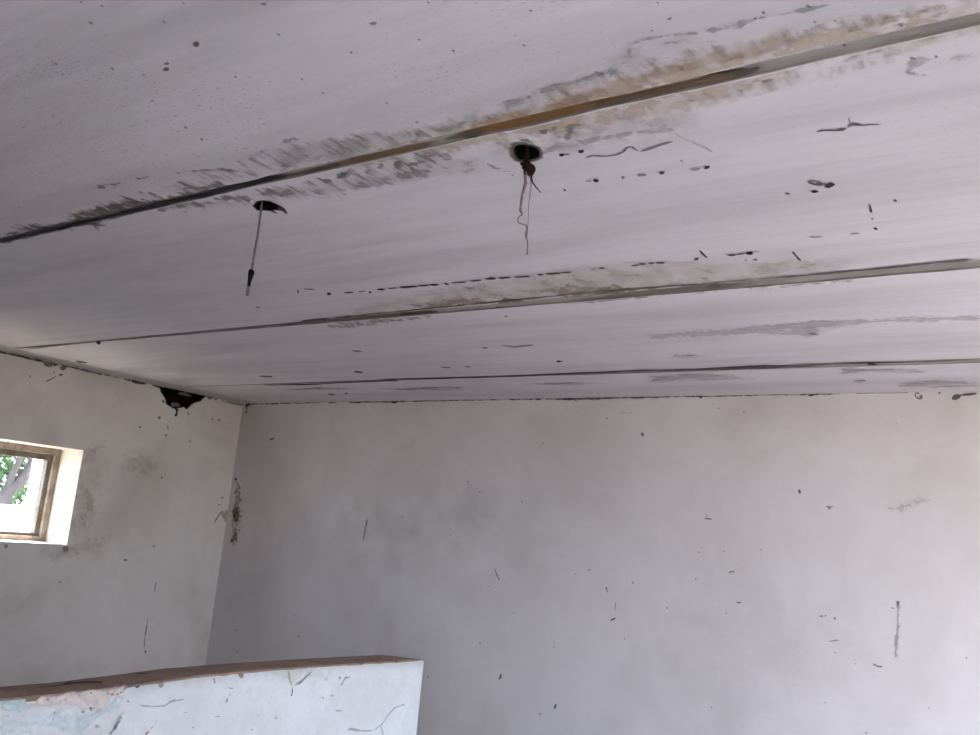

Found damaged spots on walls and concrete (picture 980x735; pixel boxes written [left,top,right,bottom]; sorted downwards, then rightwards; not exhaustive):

damp [628,28,721,53]
damp [544,69,621,99]
damp [539,124,673,152]
crack [817,117,879,132]
damp [308,150,450,195]
damp [69,151,263,231]
damp [542,284,664,303]
hole [160,386,206,416]
damp [215,478,242,545]
peeling [25,686,139,721]
crack [322,676,399,735]